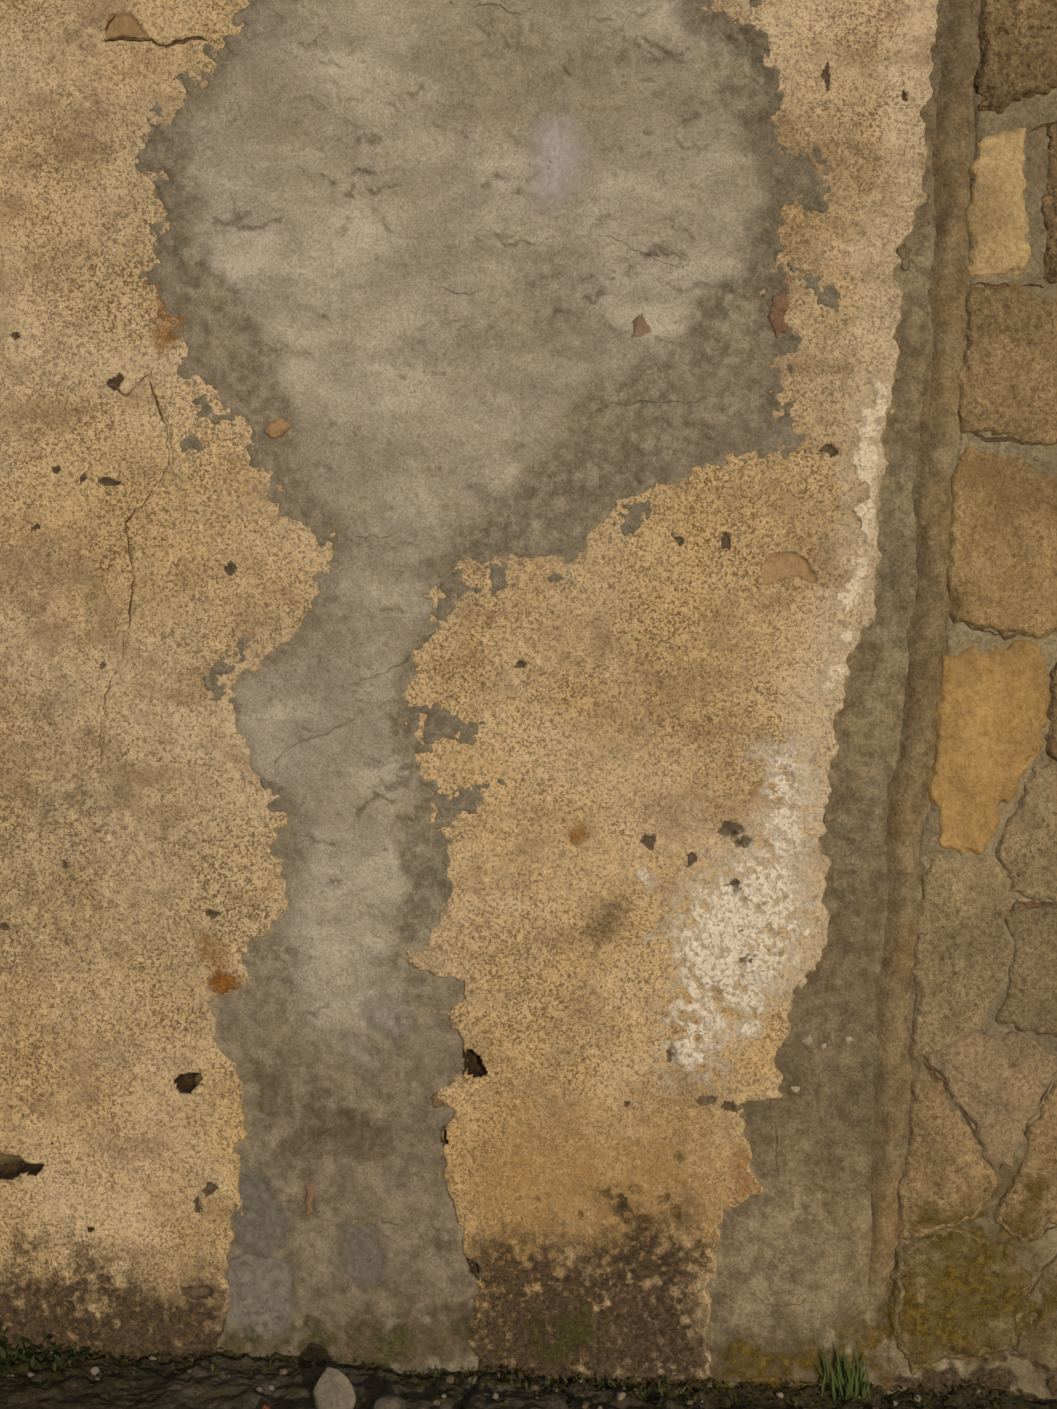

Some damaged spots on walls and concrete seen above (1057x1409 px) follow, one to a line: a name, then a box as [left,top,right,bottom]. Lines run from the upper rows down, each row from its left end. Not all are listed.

crack [98,374,182,874]
spalling [132,0,949,1393]
water stain [646,744,816,1080]
water stain [0,1191,710,1388]